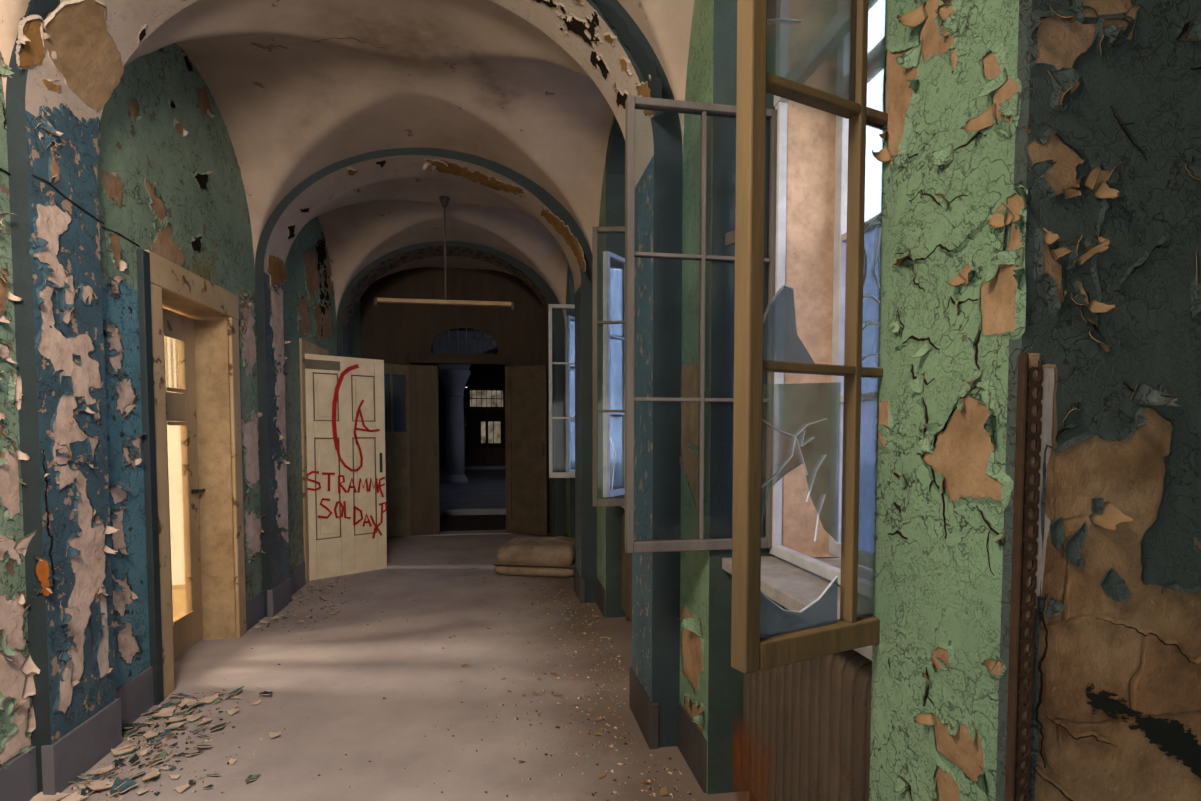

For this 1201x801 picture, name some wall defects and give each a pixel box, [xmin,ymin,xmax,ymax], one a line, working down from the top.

spalling [0,0,142,124]
peeling [137,24,148,44]
peeling [531,0,654,118]
peeling [872,0,967,169]
peeling [945,0,1141,340]
peeling [0,105,146,715]
peeling [874,399,894,455]
spalling [921,379,1014,508]
spalling [1031,364,1201,801]
peeling [0,587,40,768]
peeling [981,658,1007,678]
peeling [913,707,988,801]